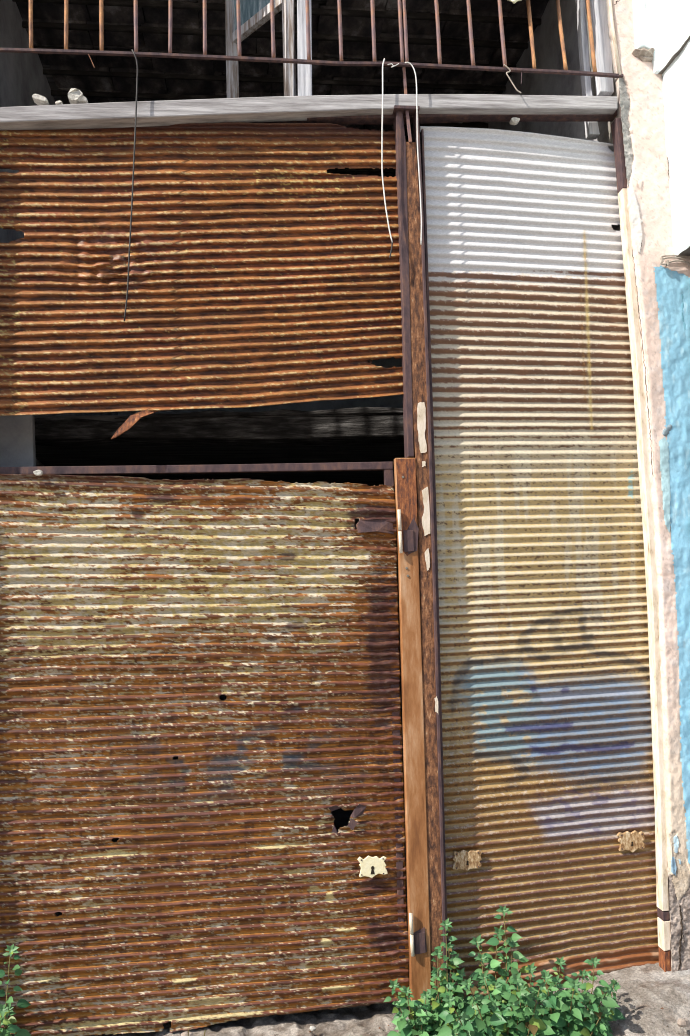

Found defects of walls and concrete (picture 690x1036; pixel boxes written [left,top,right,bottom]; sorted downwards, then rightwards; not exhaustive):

flaking render [669,831,690,973]